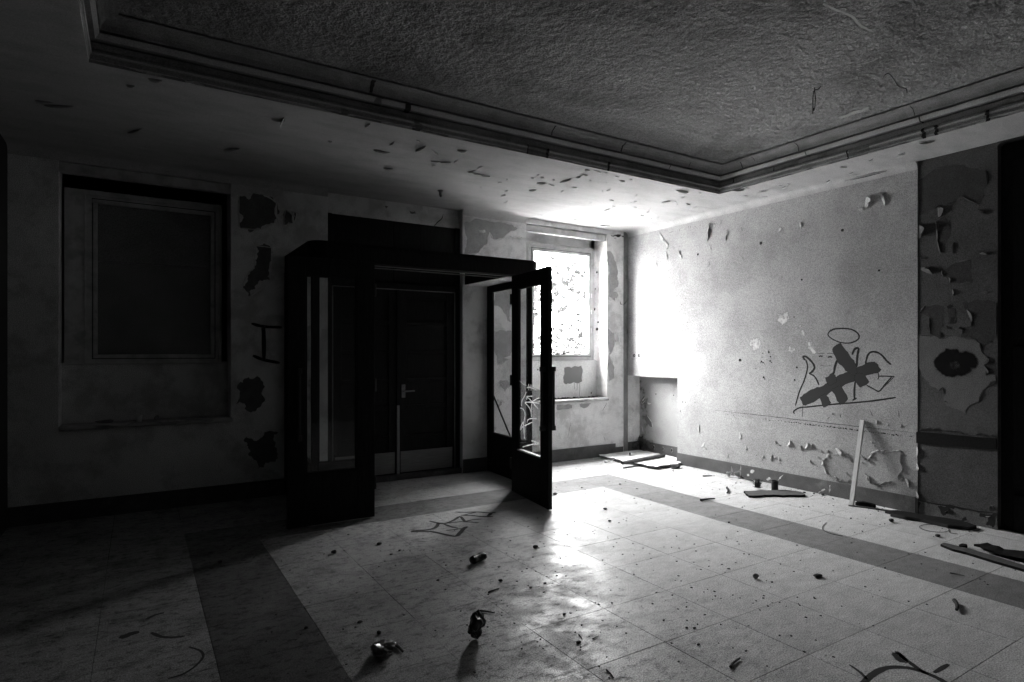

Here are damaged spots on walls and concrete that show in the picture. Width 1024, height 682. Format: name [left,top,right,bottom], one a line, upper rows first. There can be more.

peeling [238,193,297,232]
peeling [464,218,523,255]
peeling [242,244,272,297]
peeling [918,206,998,413]
peeling [237,376,265,412]
peeling [244,431,278,468]
peeling [740,434,998,530]